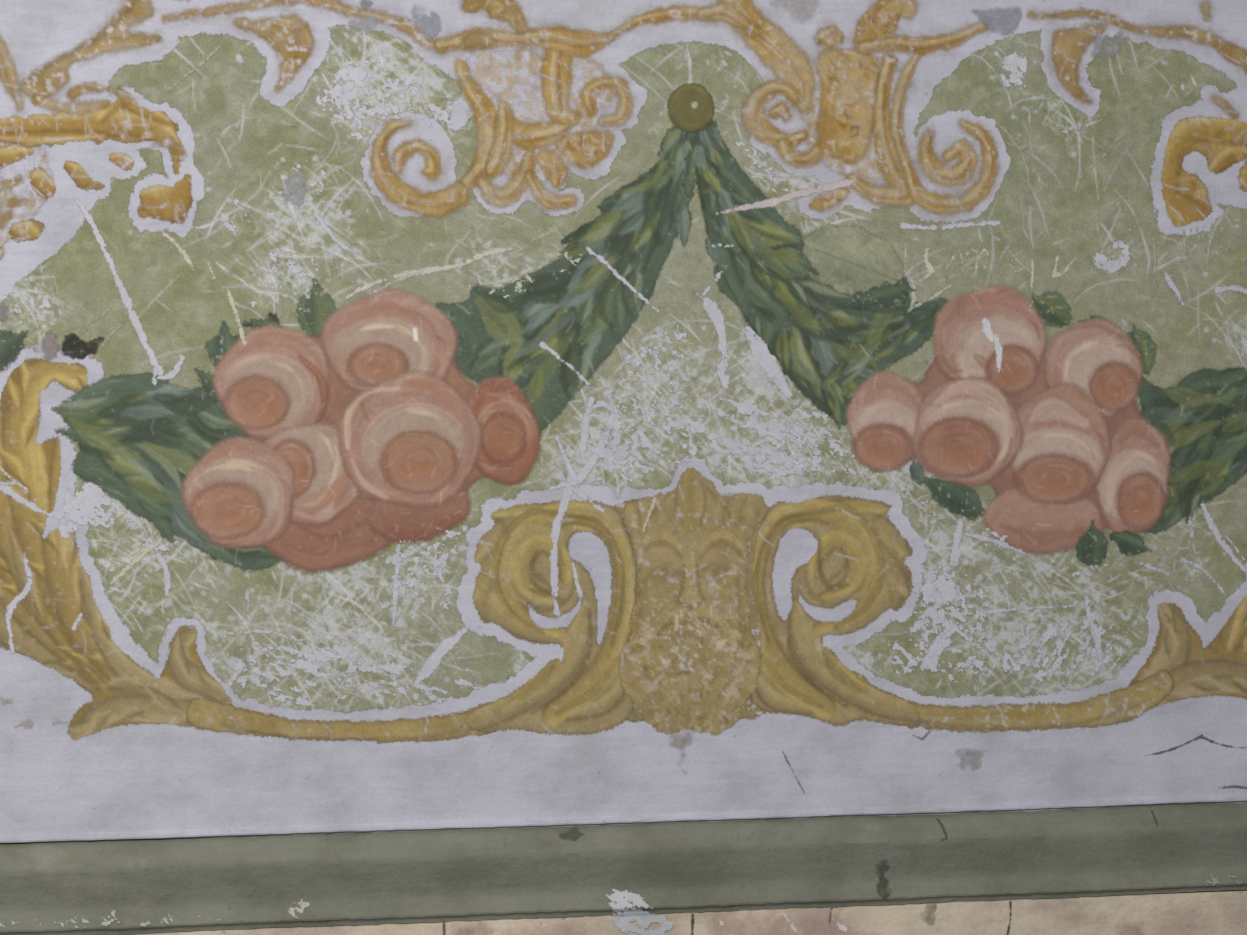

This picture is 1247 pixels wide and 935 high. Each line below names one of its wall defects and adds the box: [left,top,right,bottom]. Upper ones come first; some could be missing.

peeling [3,289,52,324]
peeling [591,323,860,482]
peeling [57,482,189,558]
peeling [375,528,469,615]
peeling [982,528,1009,550]
peeling [872,561,1128,685]
peeling [212,629,488,706]
crack [1154,735,1244,754]
flaking render [605,889,673,935]